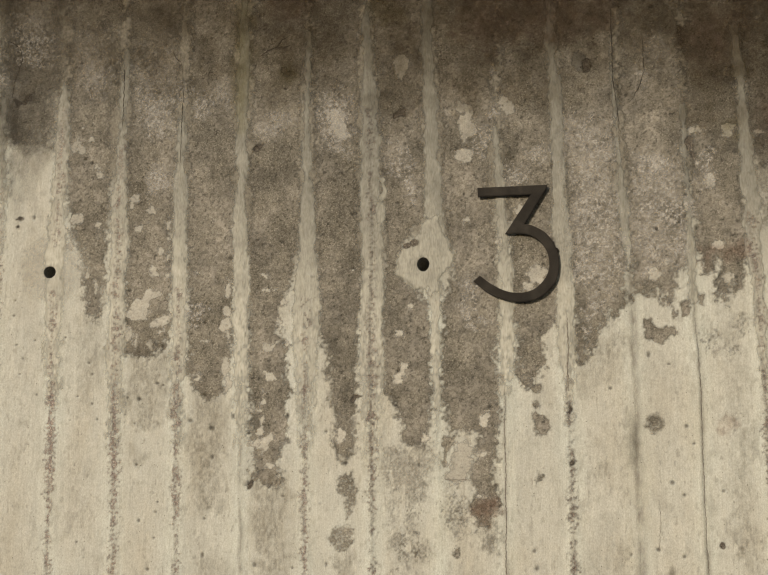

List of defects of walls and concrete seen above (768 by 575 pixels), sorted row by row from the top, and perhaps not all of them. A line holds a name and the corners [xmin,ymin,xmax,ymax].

crack [610,8,644,127]
water stain [566,124,629,280]
water stain [632,152,696,274]
crack [501,393,509,575]
crack [695,326,709,573]